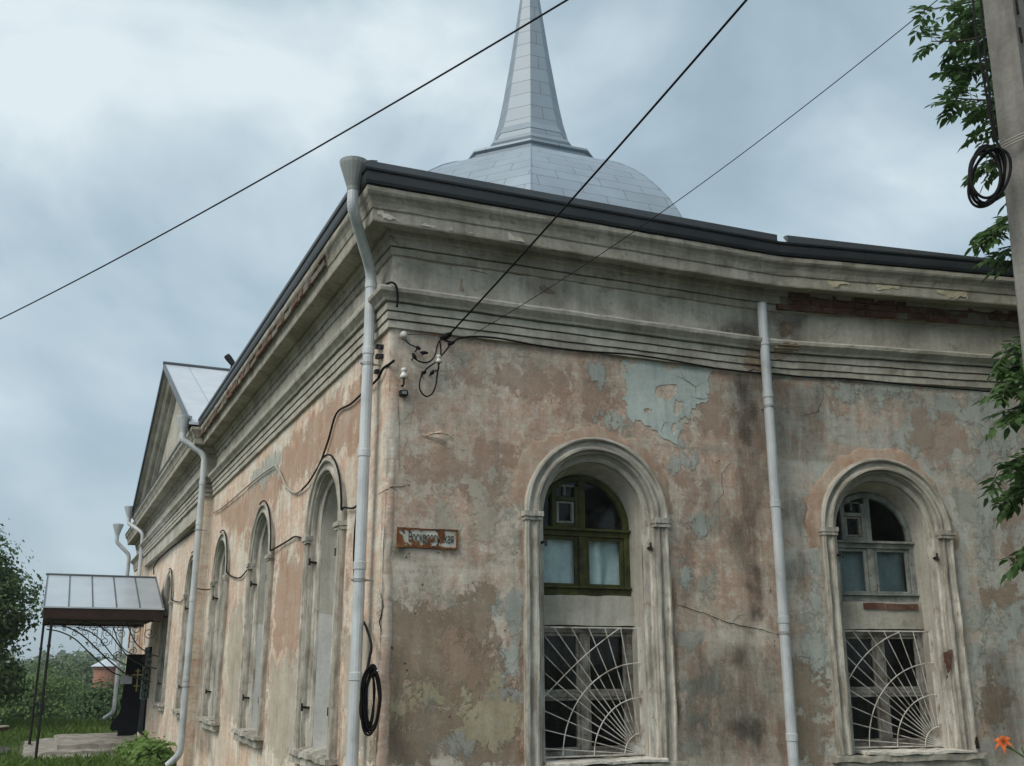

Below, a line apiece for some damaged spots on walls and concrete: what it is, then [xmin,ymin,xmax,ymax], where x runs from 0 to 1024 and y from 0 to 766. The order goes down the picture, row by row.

flaking render [742,280,1019,372]
peeling [592,360,712,449]
peeling [830,380,1024,577]
crack [676,604,775,634]